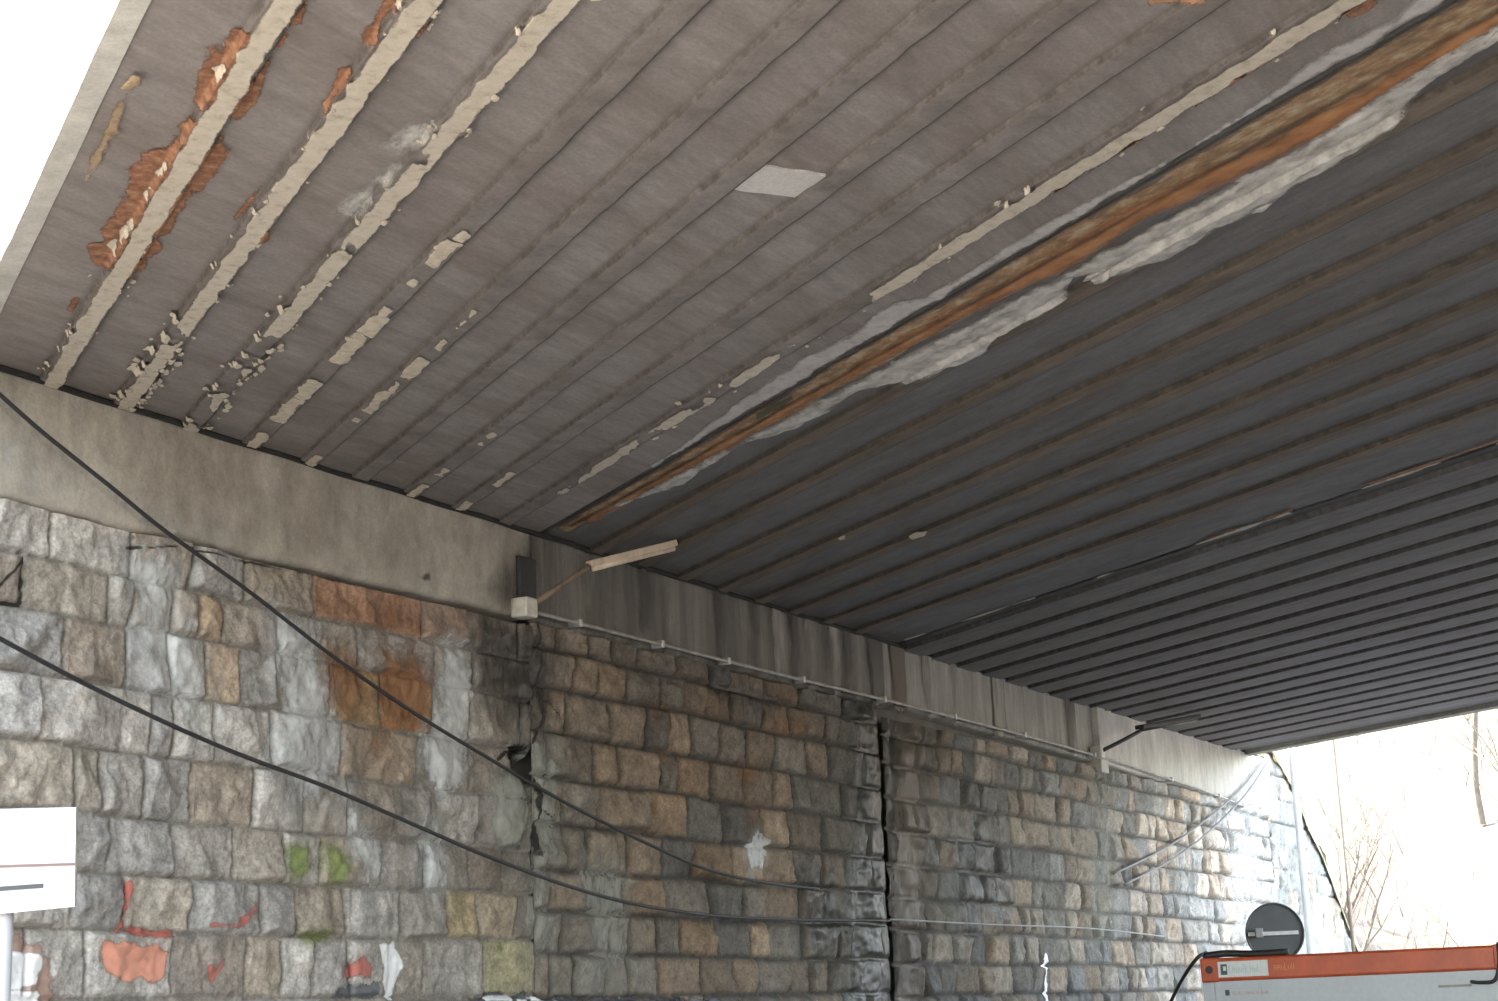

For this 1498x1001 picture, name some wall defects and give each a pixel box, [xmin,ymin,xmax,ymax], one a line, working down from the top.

rust [86,29,252,277]
peeling [36,0,302,390]
rust [231,0,307,120]
peeling [109,0,580,433]
rust [361,0,402,46]
rust [557,0,1498,532]
damp [615,27,1498,507]
peeling [863,0,1377,312]
damp [1195,0,1444,145]
peeling [247,379,323,448]
peeling [557,337,820,495]
rust [380,652,424,724]